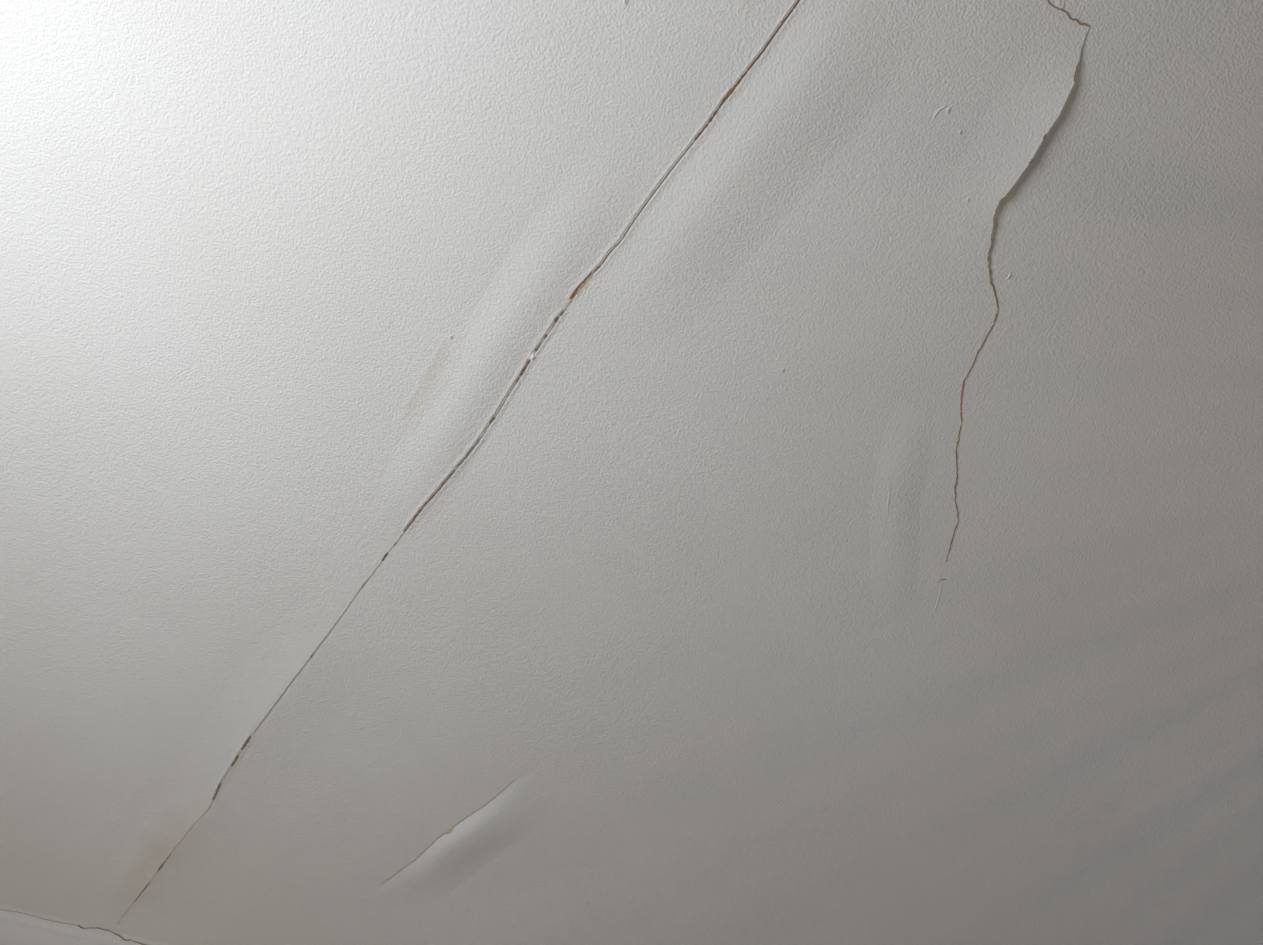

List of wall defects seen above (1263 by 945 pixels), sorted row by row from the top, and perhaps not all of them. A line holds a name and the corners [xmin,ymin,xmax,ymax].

crack [1048,0,1089,27]
crack [0,0,807,945]
crack [933,188,1012,613]